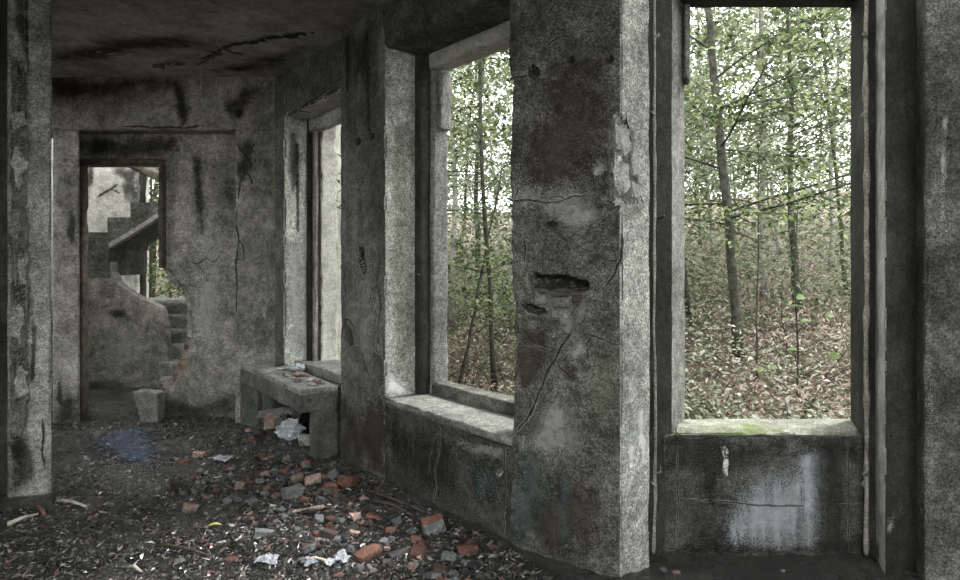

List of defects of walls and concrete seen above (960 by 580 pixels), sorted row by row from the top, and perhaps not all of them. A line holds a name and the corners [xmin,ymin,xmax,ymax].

crack [199,32,315,60]
leakage [226,88,257,118]
leakage [193,158,203,228]
crack [506,188,594,205]
peeling [609,116,642,206]
crack [191,143,255,327]
spalling [521,273,598,338]
crack [509,232,624,438]
leakage [667,436,782,504]
leakage [676,443,879,560]